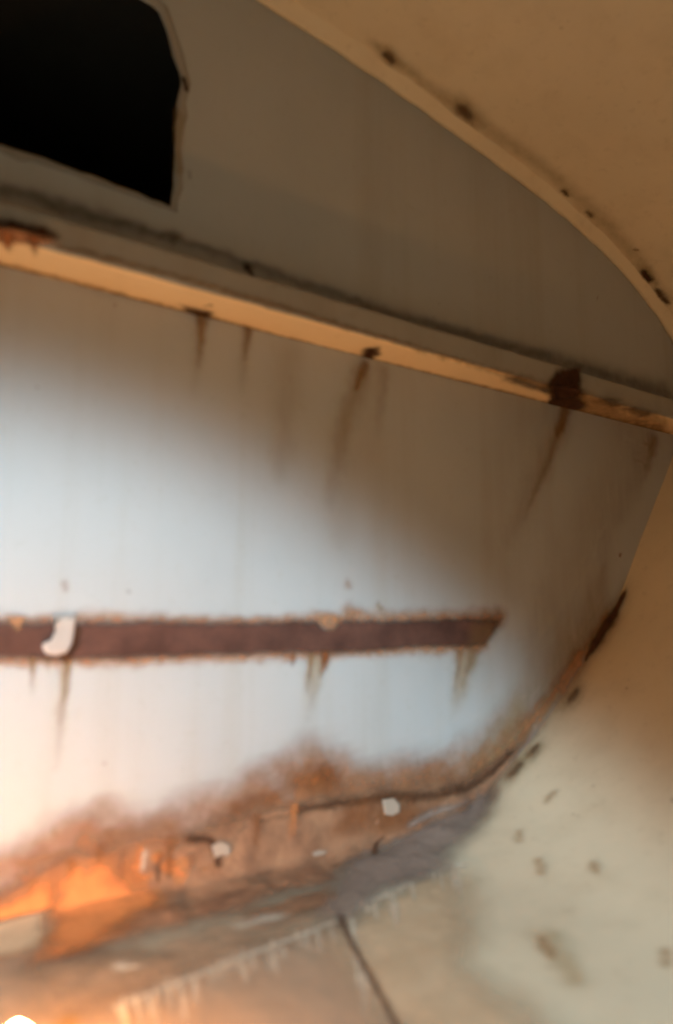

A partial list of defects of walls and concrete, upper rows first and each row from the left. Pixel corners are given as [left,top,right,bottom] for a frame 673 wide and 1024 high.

rust [0,220,57,250]
rust [0,263,274,337]
rust [356,348,380,389]
rust [546,367,668,435]
rust [0,611,503,671]
rust [209,763,472,826]
peeling [382,798,400,816]
peeling [212,842,231,858]